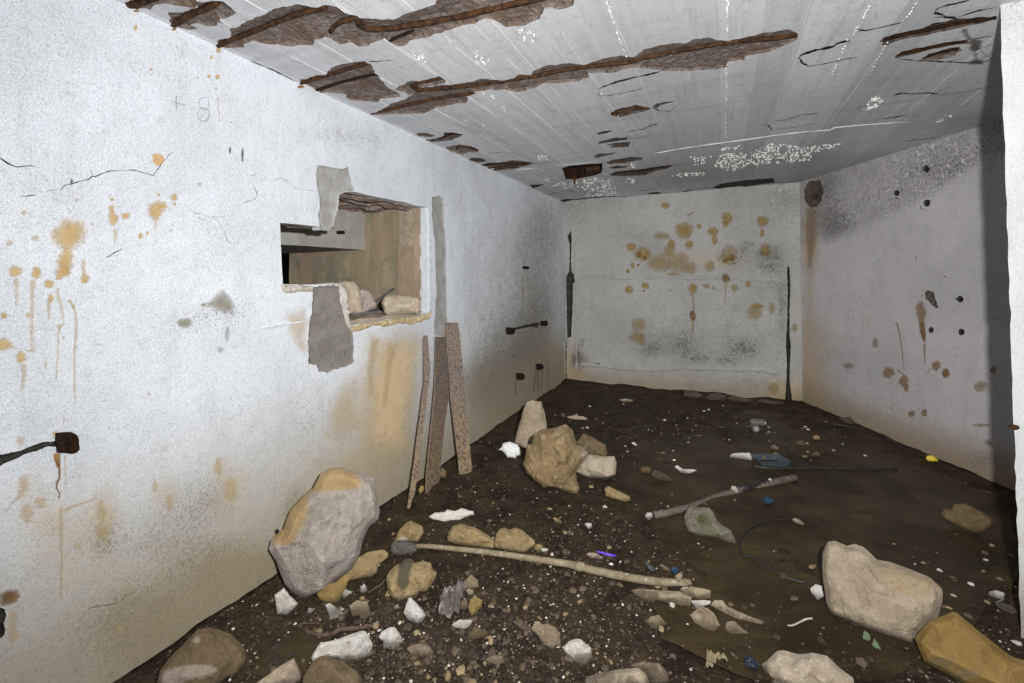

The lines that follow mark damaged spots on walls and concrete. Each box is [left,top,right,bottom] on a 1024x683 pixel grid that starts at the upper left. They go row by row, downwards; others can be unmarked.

spalling [125,0,574,48]
crack [798,22,902,67]
spalling [880,16,997,61]
spalling [300,29,798,117]
crack [22,153,172,197]
spalling [415,132,535,171]
spalling [594,130,673,176]
corrosion [149,193,177,218]
corrosion [10,220,85,302]
corrosion [626,212,750,333]
corrosion [0,338,25,363]
corrosion [916,302,949,378]